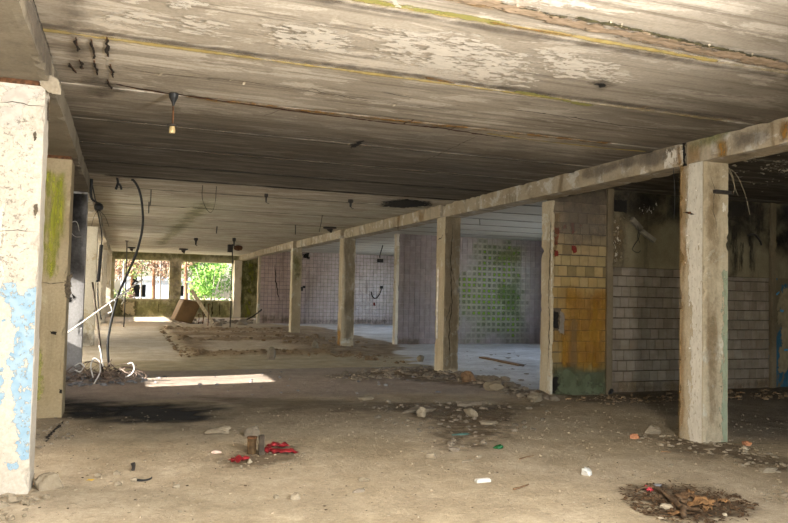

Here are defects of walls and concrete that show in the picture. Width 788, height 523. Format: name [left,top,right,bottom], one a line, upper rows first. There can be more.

peeling [261,19,355,54]
peeling [367,25,632,88]
spalling [451,0,788,71]
spalling [0,75,61,130]
damp [731,203,763,270]
peeling [0,201,36,471]
peeling [776,287,788,373]